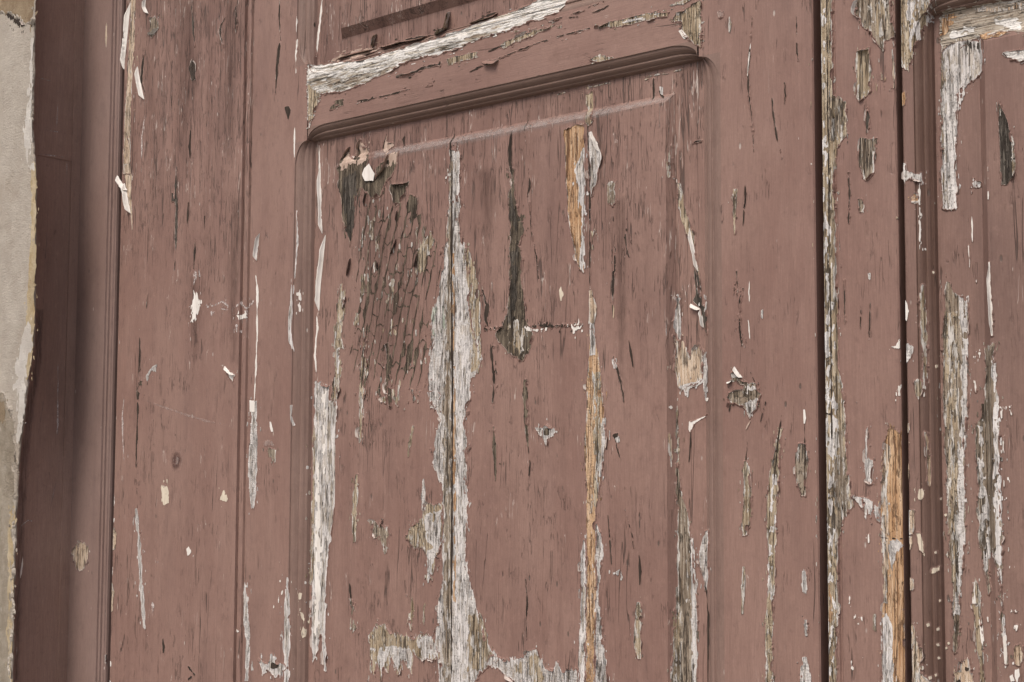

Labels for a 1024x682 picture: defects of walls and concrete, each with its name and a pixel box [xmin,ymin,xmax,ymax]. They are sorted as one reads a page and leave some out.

peeling [115,0,162,230]
peeling [314,0,324,58]
peeling [331,12,450,63]
peeling [446,22,562,72]
peeling [901,38,1015,211]
peeling [246,275,277,509]
crack [333,187,443,446]
peeling [667,224,709,460]
peeling [349,501,444,682]
peeling [486,642,586,682]
peeling [738,409,813,682]